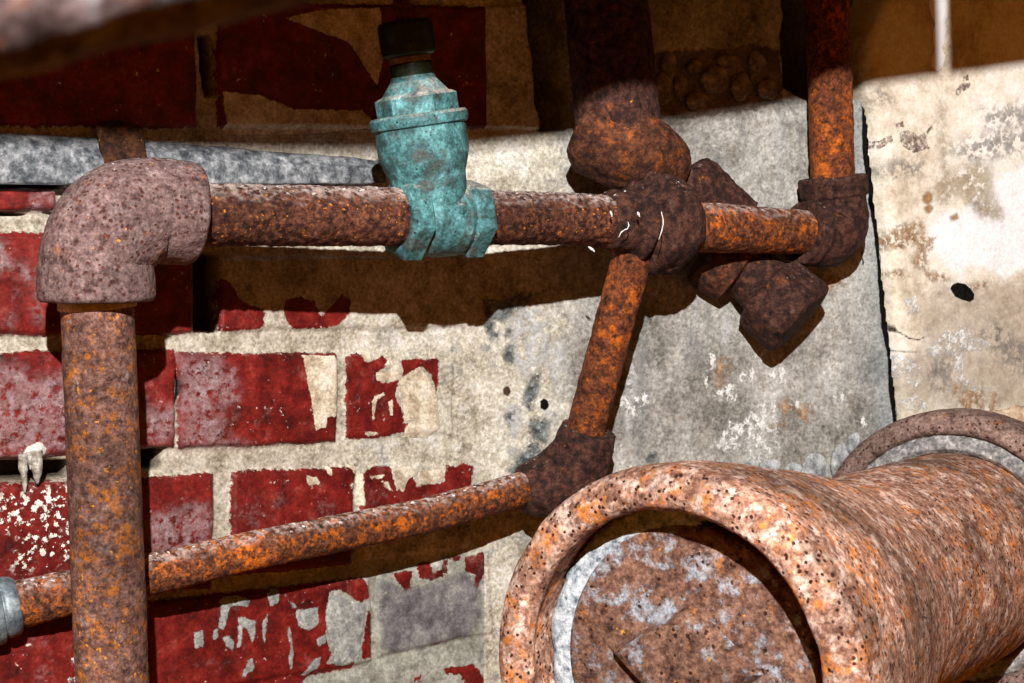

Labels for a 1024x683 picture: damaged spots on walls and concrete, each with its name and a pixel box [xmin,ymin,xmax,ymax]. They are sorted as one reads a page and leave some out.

peeling [287,7,383,85]
peeling [223,91,371,136]
damp [963,111,1024,154]
damp [940,170,997,213]
damp [991,325,1024,367]
peeling [302,355,338,431]
peeling [194,587,367,676]